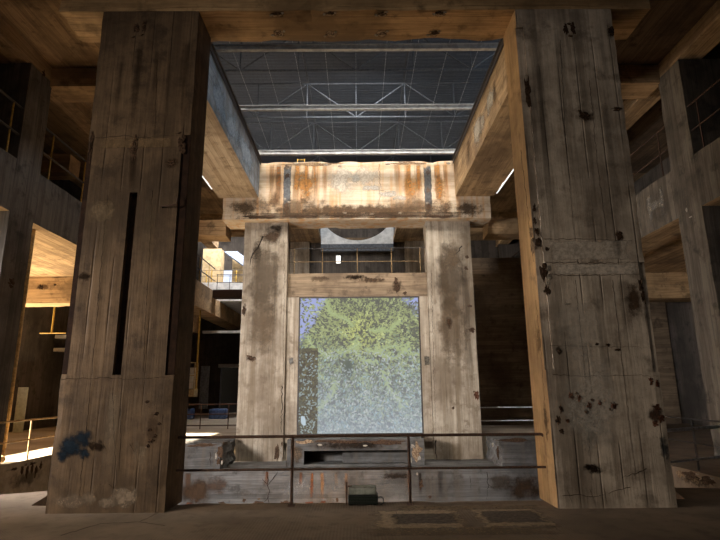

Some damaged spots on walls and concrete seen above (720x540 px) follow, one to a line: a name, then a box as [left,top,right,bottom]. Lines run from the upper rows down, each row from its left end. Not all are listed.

rust [270,166,281,207]
rust [294,165,326,198]
rust [406,165,421,197]
rust [434,165,443,199]
damp [231,167,482,310]
damp [439,245,465,353]
spalling [177,438,544,505]